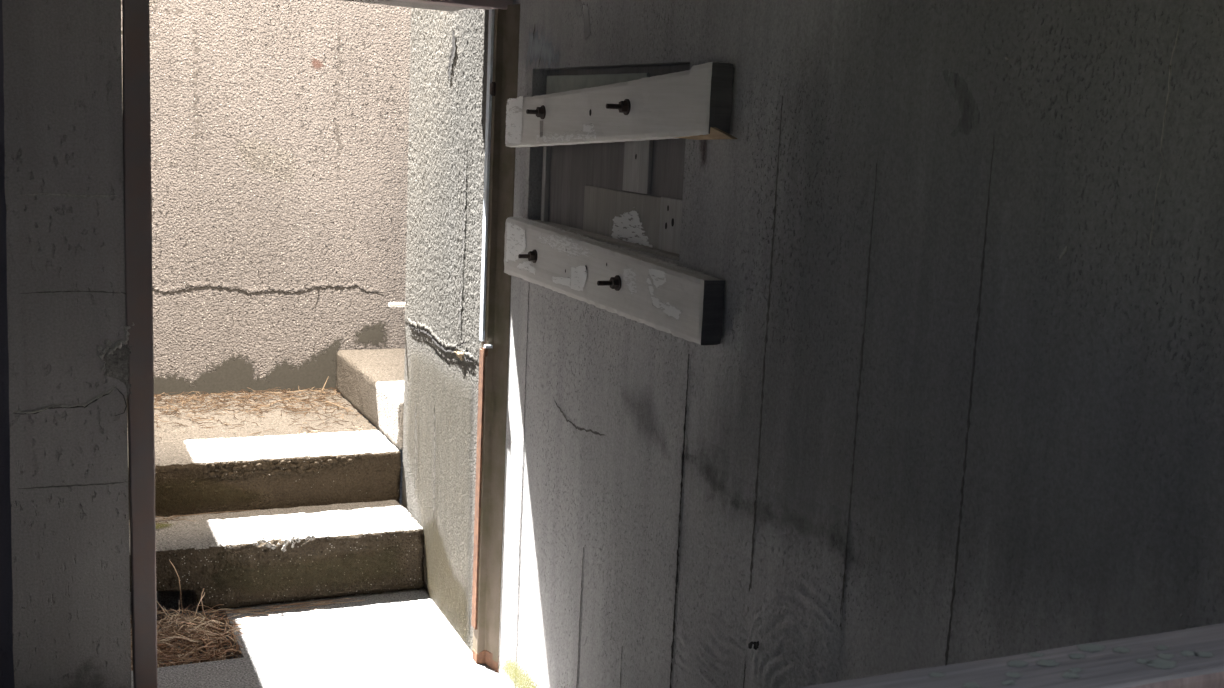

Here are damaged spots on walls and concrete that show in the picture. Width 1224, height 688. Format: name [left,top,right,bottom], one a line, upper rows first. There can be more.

crack [20,281,383,308]
crack [407,318,473,362]
crack [13,386,127,416]
crack [555,402,604,436]